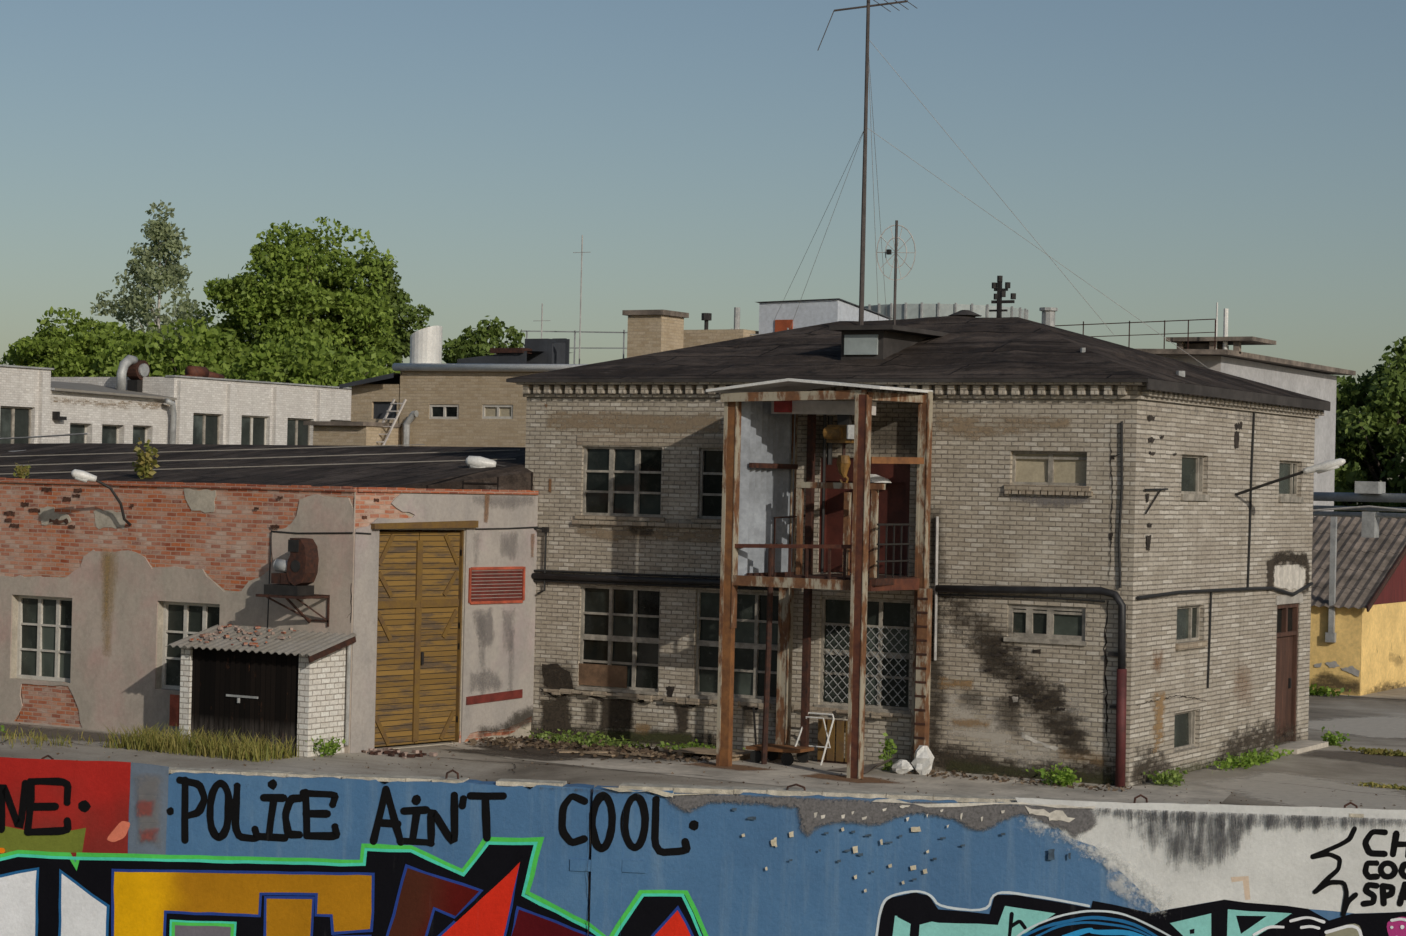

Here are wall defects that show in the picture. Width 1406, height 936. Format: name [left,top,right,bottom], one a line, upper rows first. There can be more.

peeling [0,483,412,591]
peeling [15,682,82,727]
water stain [929,596,1406,785]
rust [683,763,769,771]
spalling [603,787,1167,911]
water stain [1098,808,1402,865]